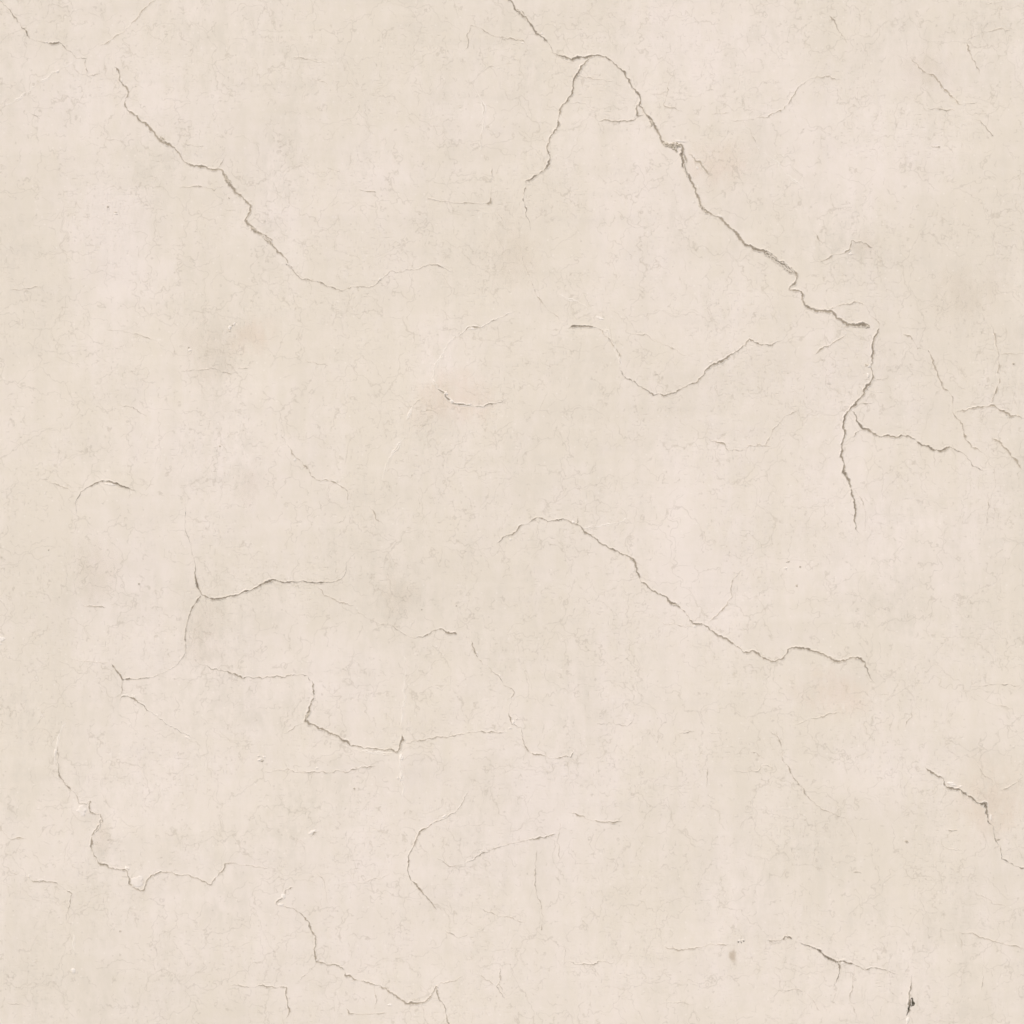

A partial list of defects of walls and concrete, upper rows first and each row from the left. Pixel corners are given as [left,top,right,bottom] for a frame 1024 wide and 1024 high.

crack [0,0,452,294]
crack [427,0,1023,533]
crack [76,507,576,799]
crack [496,516,889,695]
crack [54,722,507,1024]
crack [437,812,622,930]
crack [925,766,1024,870]